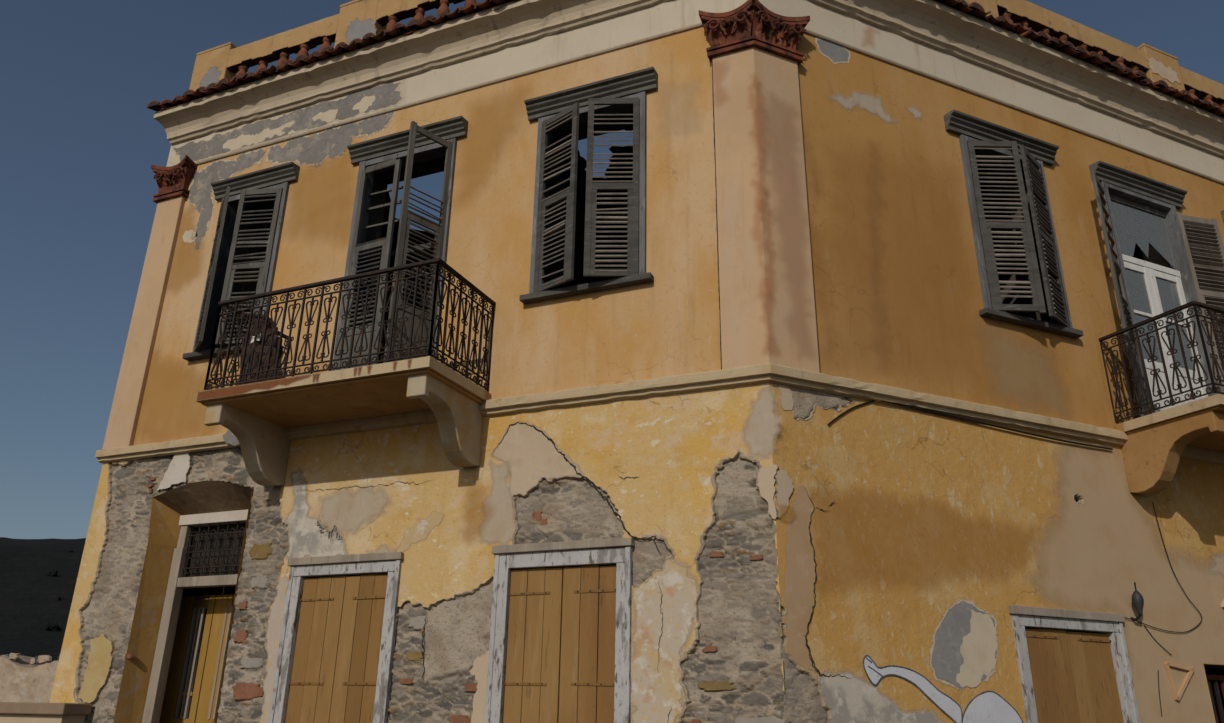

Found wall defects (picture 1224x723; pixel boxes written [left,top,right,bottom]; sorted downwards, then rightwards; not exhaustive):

peeling [169,80,404,249]
peeling [831,91,895,123]
spalling [73,430,388,723]
spalling [387,575,494,723]
spalling [479,385,944,723]
peeling [929,598,998,690]